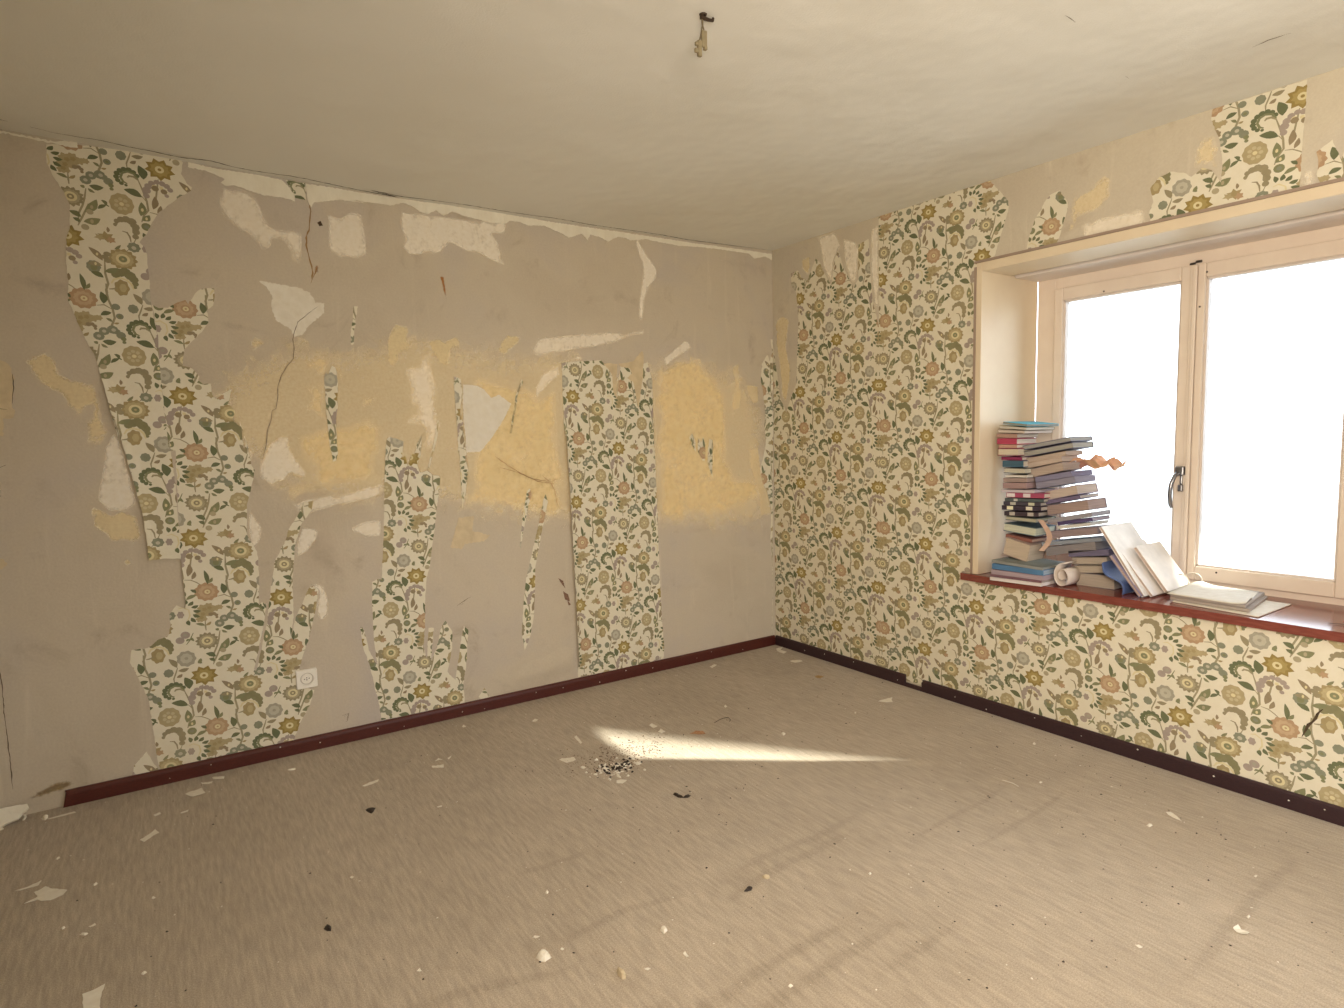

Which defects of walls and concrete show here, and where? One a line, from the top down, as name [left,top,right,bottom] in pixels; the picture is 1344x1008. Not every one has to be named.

peeling [463,384,511,453]